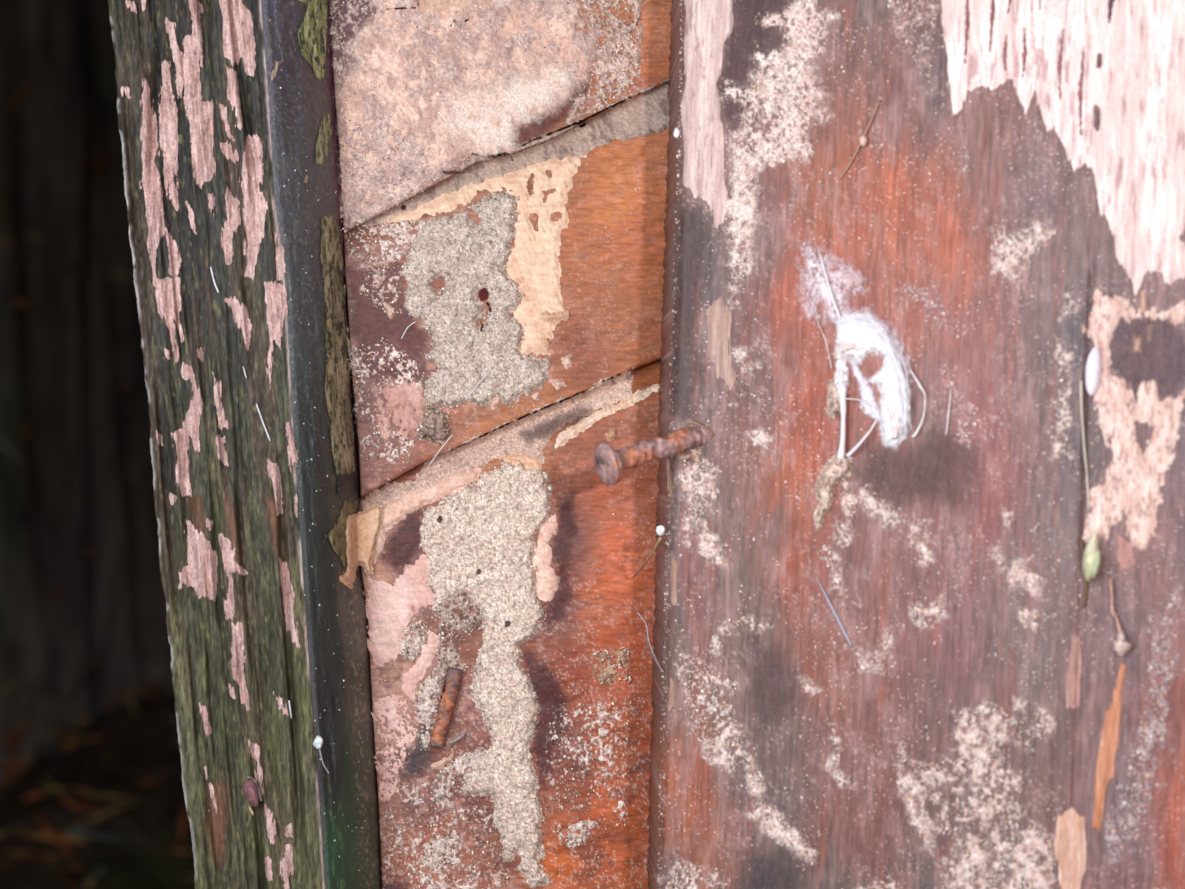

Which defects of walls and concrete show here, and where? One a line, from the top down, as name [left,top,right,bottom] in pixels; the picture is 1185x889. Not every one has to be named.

peeling [121,0,288,505]
peeling [320,215,355,475]
peeling [379,154,587,390]
peeling [941,0,1185,572]
peeling [178,518,252,711]
peeling [266,422,299,518]
peeling [278,557,300,649]
peeling [325,467,481,667]
peeling [532,514,560,602]
peeling [199,702,212,737]
peeling [248,739,295,889]
peeling [371,630,441,803]